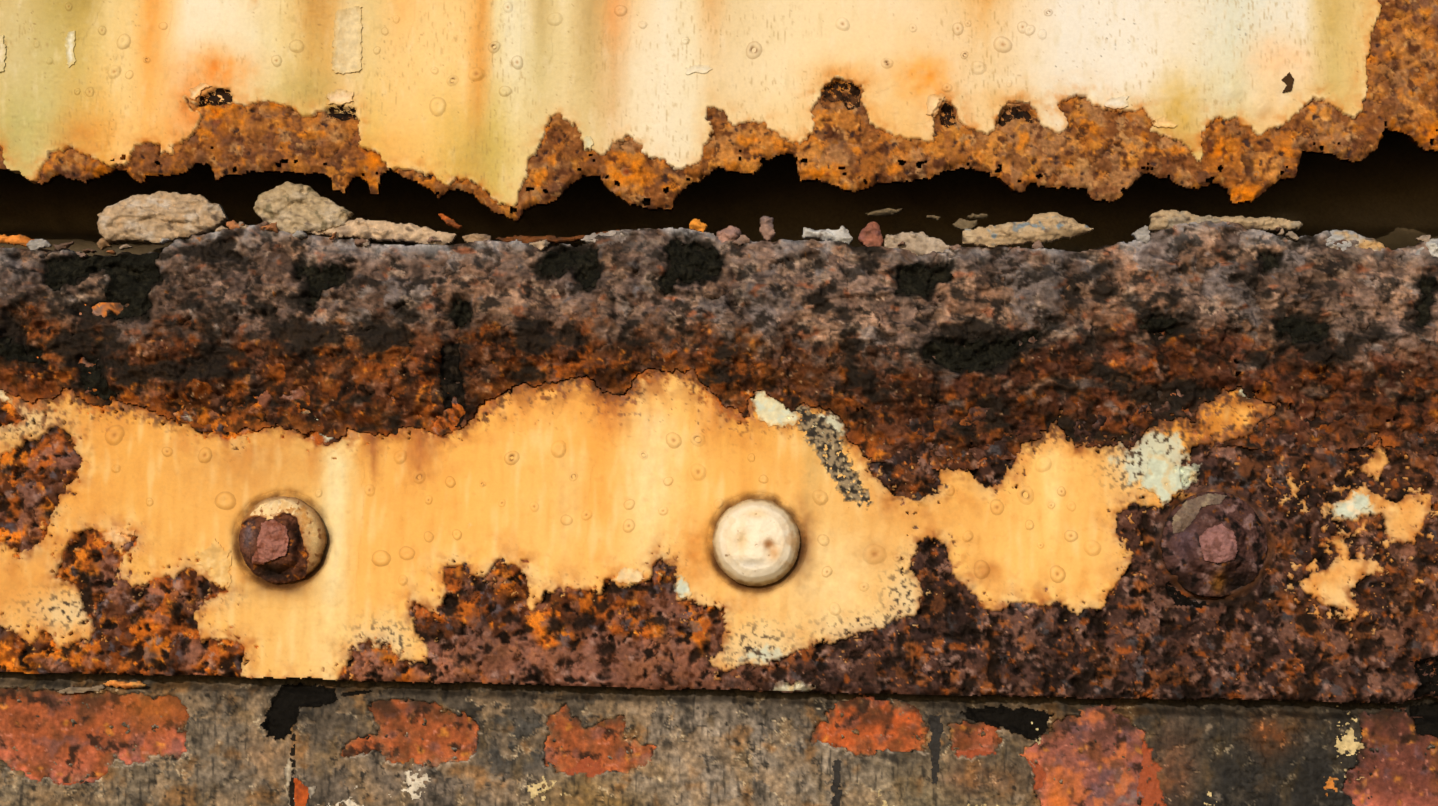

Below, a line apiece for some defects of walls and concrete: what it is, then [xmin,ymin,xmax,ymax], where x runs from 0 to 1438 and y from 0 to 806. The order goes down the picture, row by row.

rust [37,0,1438,245]
rust [0,234,34,247]
rust [884,212,1093,256]
rust [137,375,648,517]
peeling [751,390,802,429]
rust [0,389,312,694]
rust [338,402,1438,806]
peeling [0,686,189,784]
peeling [341,699,480,768]
peeling [810,694,929,757]
peeling [1019,704,1145,806]
peeling [1337,706,1438,806]